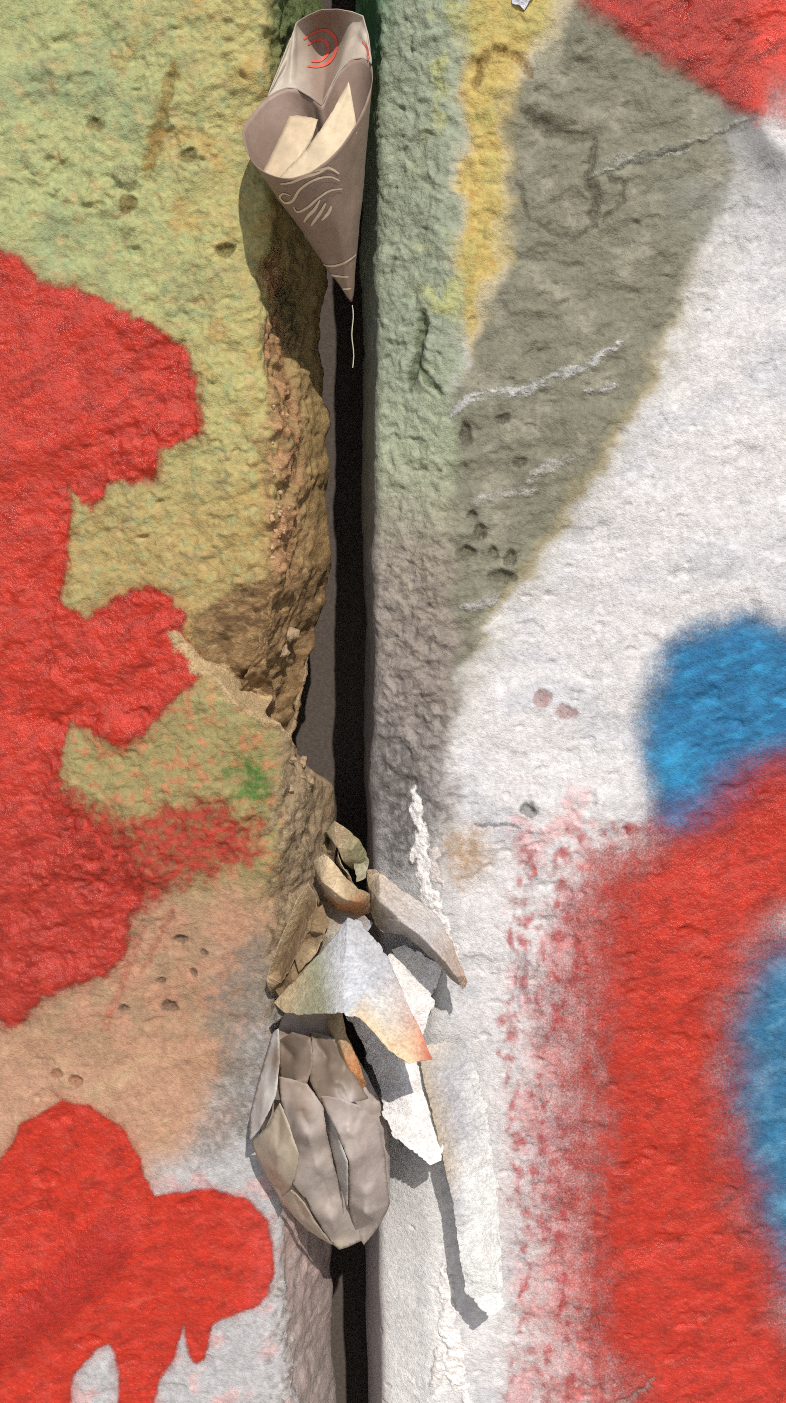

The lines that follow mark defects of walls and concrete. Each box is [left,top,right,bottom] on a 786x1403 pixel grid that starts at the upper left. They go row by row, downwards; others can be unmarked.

spalling [535,690,578,718]
peeling [167,255,526,1403]
spalling [520,802,537,818]
peeling [512,1095,577,1214]